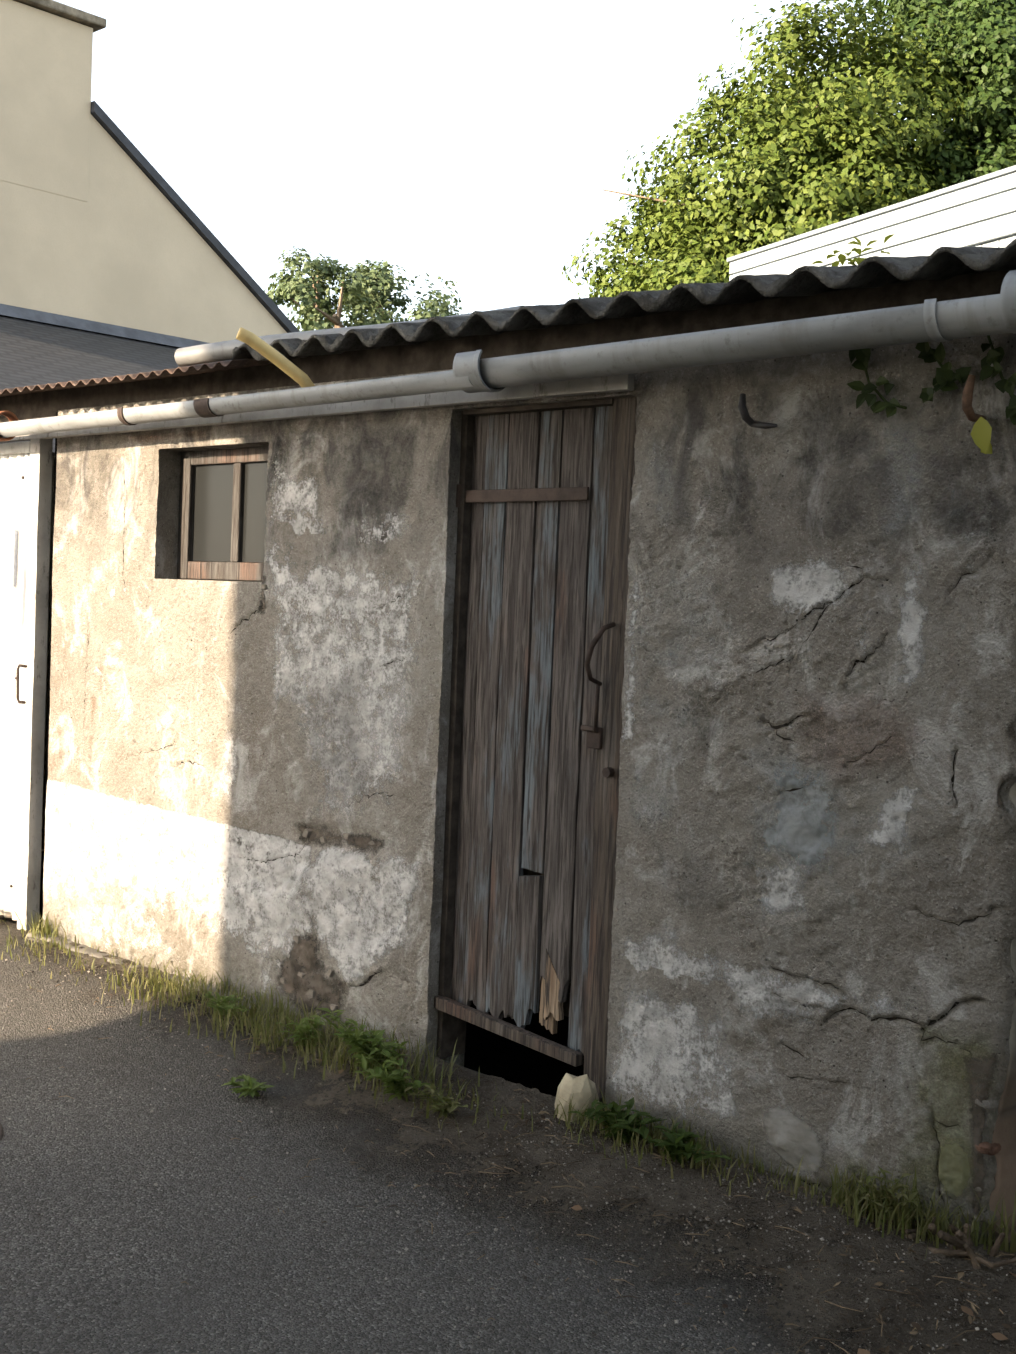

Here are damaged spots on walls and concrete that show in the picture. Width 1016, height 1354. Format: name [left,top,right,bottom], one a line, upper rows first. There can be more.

crack [756,565,889,673]
crack [766,715,803,741]
crack [950,749,958,806]
crack [920,907,999,926]
crack [773,968,982,1056]